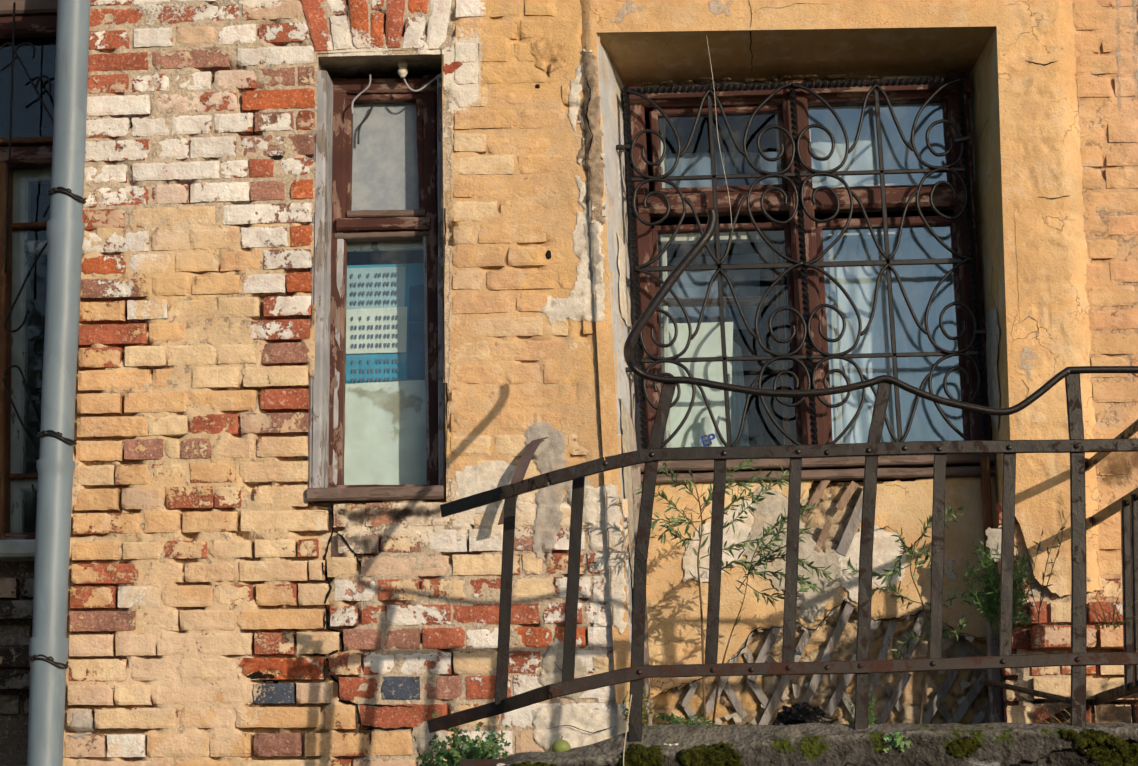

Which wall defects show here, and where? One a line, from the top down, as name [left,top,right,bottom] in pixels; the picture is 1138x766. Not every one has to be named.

crack [749,3,818,65]
flaking render [531,38,628,326]
crack [311,501,425,764]
peeling [564,396,635,634]
peeling [683,486,907,662]
flaking render [986,525,1002,561]
flaking render [532,702,629,751]